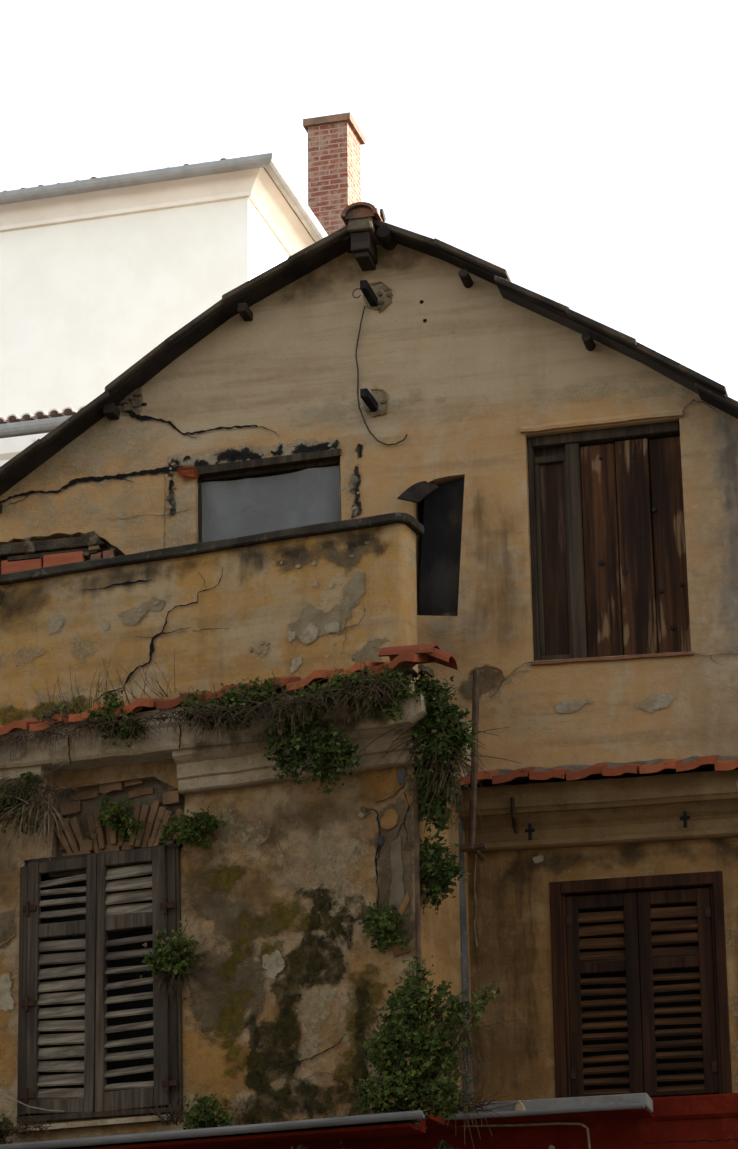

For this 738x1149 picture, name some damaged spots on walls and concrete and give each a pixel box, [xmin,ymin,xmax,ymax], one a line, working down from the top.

crack [122,403,280,438]
crack [0,466,189,546]
flaking render [166,438,363,518]
peeling [118,597,165,625]
crack [83,568,229,702]
spalling [277,539,387,673]
peeling [0,972,14,1011]
water stain [245,1014,261,1089]
peeling [262,950,285,979]
water stain [280,996,298,1102]
water stain [308,894,345,984]
water stain [353,978,370,1081]